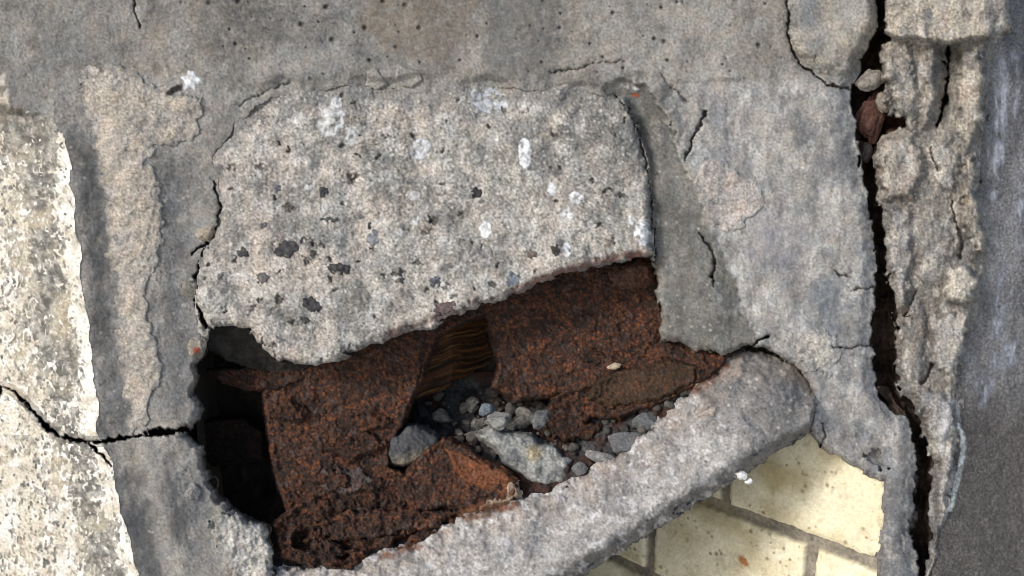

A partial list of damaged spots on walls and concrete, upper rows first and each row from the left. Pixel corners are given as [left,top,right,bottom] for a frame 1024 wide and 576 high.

crack [833,0,934,576]
crack [0,386,190,459]
peeling [307,413,393,495]
rust [444,448,519,521]
peeling [546,416,603,443]
spalling [863,449,890,471]
spalling [204,511,275,576]
peeling [313,506,460,542]